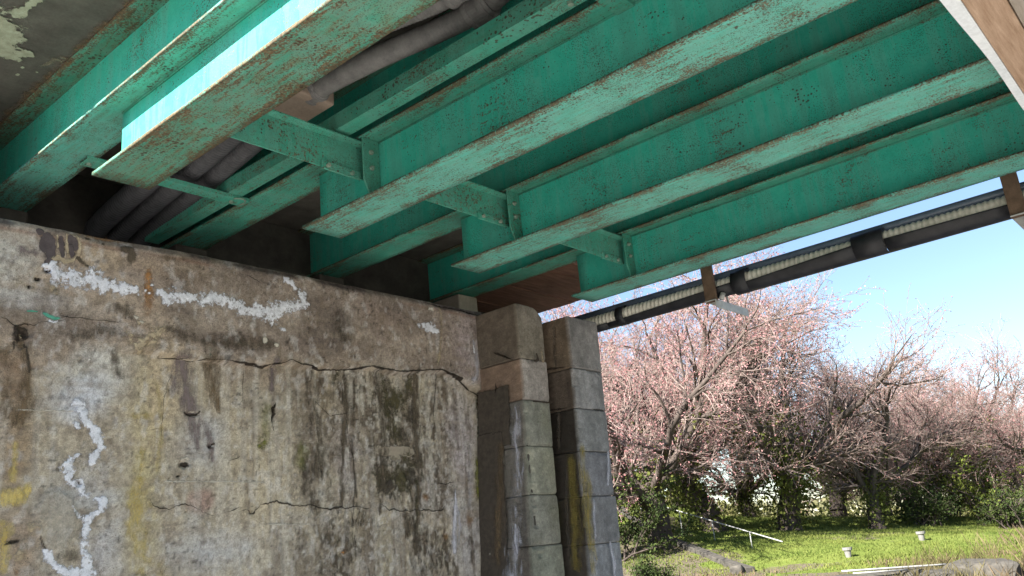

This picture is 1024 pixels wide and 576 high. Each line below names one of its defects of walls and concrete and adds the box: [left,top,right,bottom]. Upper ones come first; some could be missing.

peeling [0,0,43,76]
water stain [42,260,139,319]
water stain [156,277,310,462]
crack [150,401,454,543]
water stain [269,371,365,576]
crack [152,358,497,448]
water stain [376,370,389,515]
water stain [403,369,521,576]